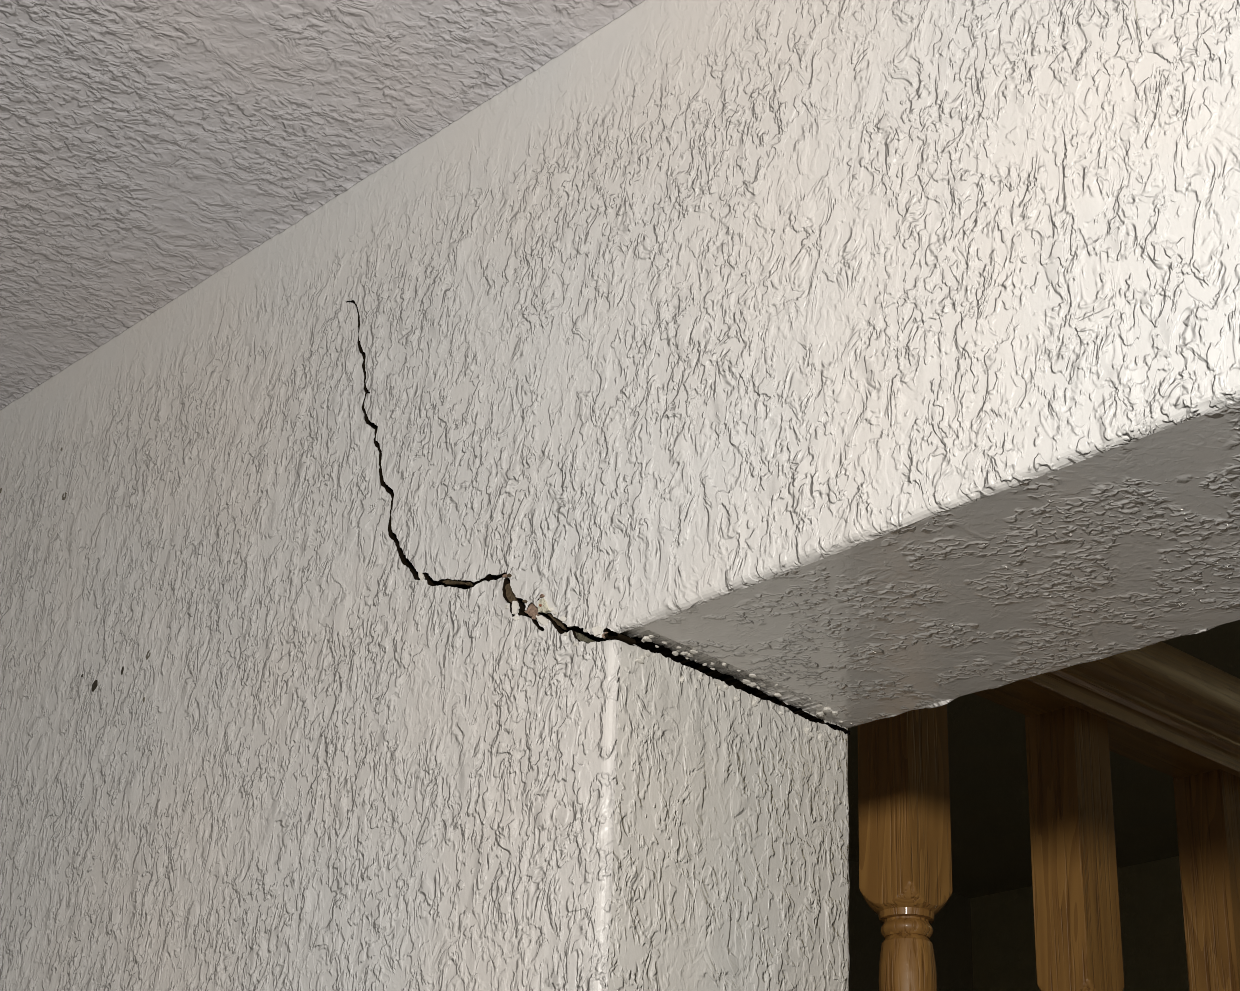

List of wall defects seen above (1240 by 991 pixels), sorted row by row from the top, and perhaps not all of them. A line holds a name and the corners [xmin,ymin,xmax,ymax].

crack [346,300,851,742]